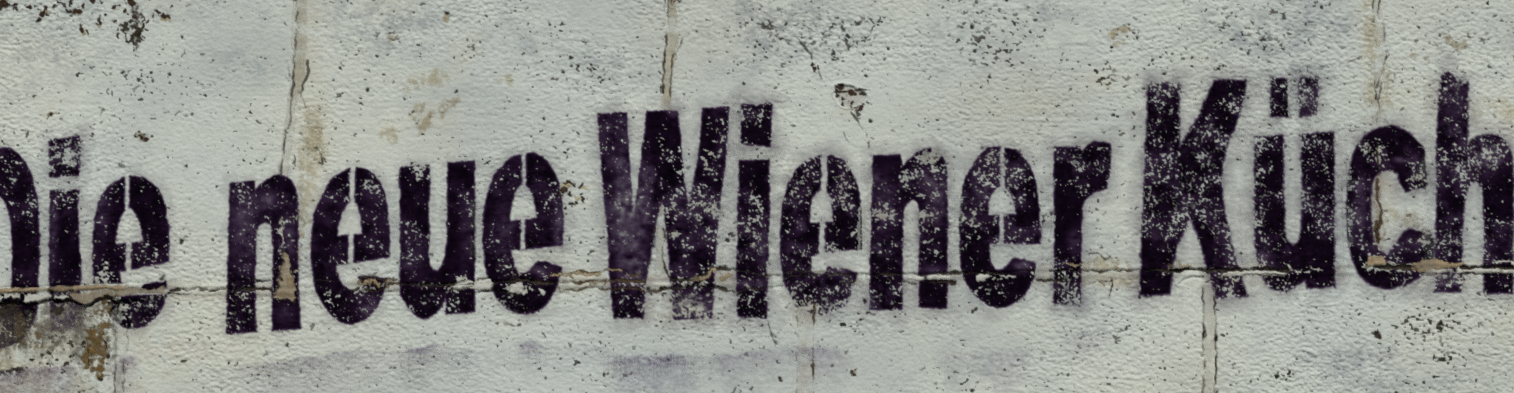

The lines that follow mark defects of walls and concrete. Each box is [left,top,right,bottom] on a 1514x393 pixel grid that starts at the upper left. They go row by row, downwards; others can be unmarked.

spalling [0,0,123,35]
crack [280,0,323,176]
water stain [0,297,85,374]
crack [168,280,273,295]
crack [351,229,996,344]
crack [1032,253,1290,393]
crack [1460,265,1514,275]